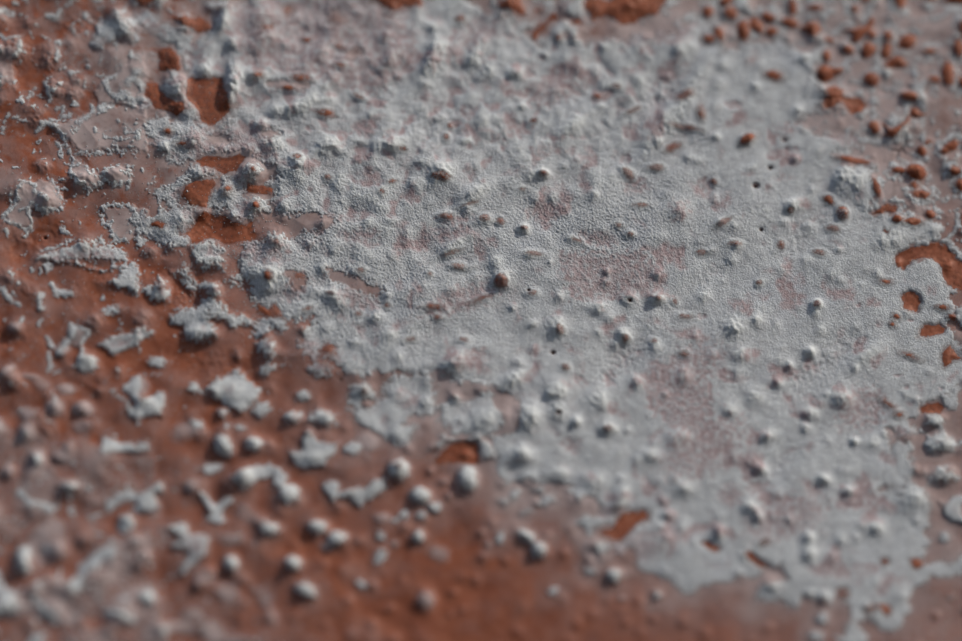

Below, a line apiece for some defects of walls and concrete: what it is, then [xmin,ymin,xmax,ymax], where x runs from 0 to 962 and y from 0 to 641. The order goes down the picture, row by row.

peeling [186,77,230,125]
peeling [821,90,866,114]
peeling [197,155,245,174]
peeling [187,211,256,244]
peeling [895,242,962,290]
peeling [901,291,921,313]
peeling [920,324,945,337]
peeling [601,510,647,540]
peeling [701,541,720,552]
peeling [745,551,768,567]